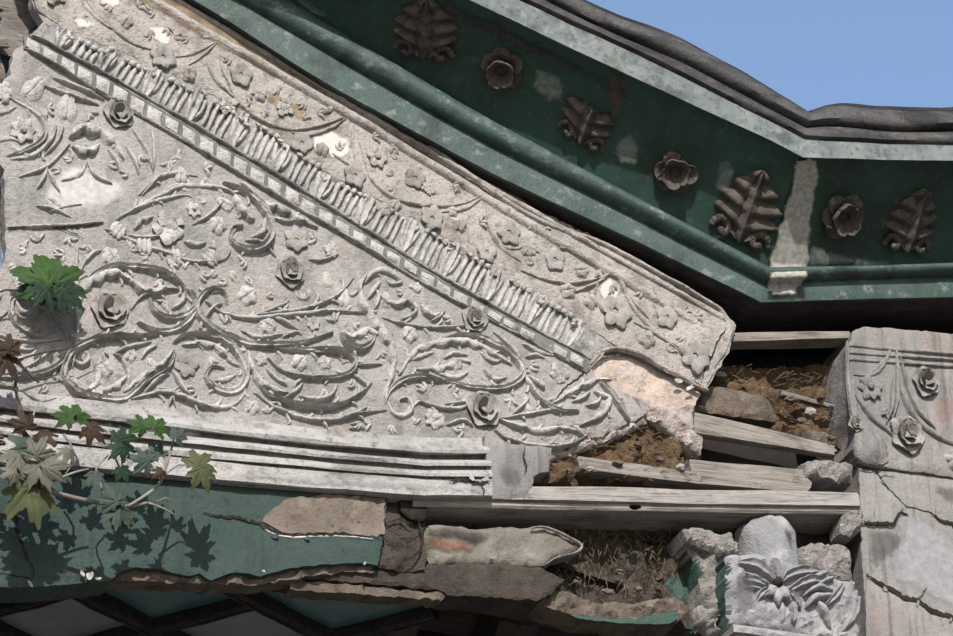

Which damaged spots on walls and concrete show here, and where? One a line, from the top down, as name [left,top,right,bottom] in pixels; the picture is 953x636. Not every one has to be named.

peeling [768,158,834,294]
spalling [550,346,709,462]
crack [0,513,35,587]
spalling [673,546,723,612]
crack [864,482,906,525]
crack [867,573,953,620]
crack [931,512,953,526]